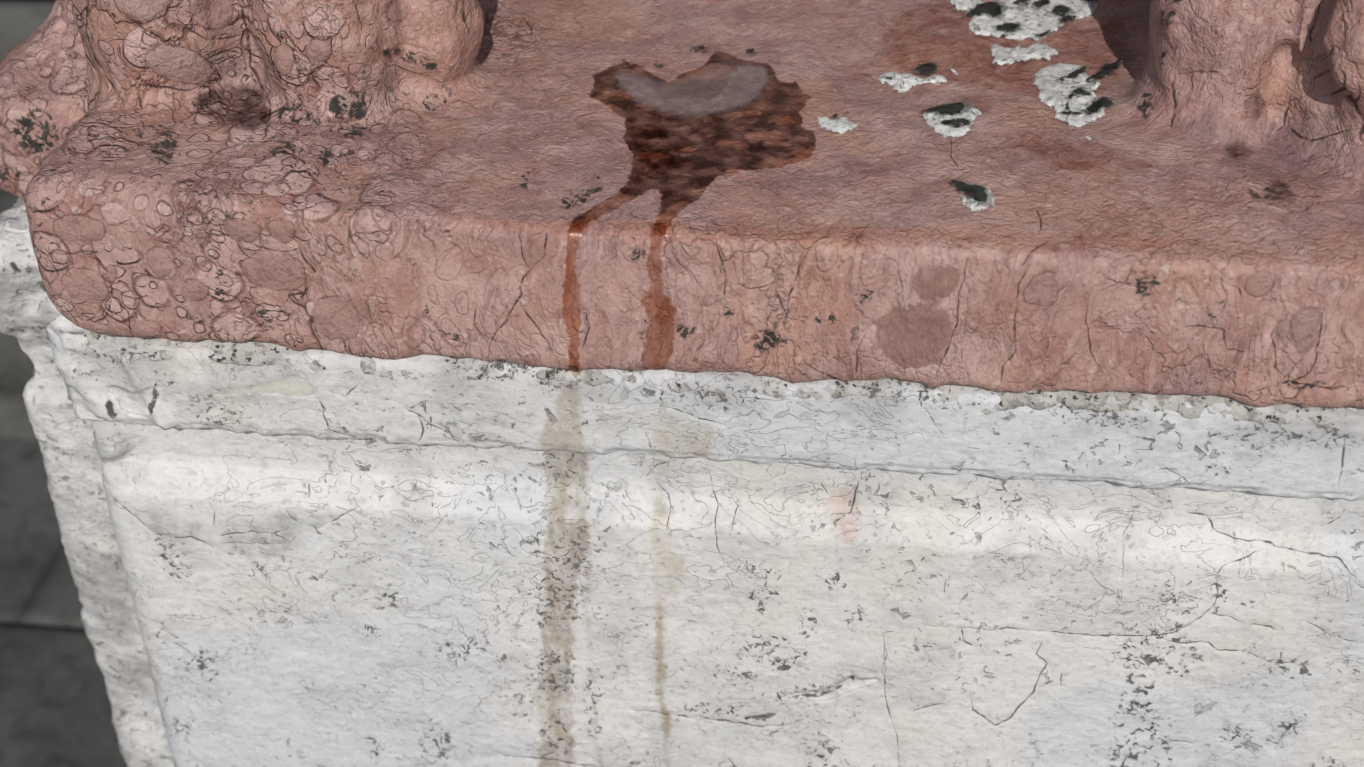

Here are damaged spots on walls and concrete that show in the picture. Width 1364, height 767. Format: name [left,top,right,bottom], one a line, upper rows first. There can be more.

crack [944,513,1364,725]